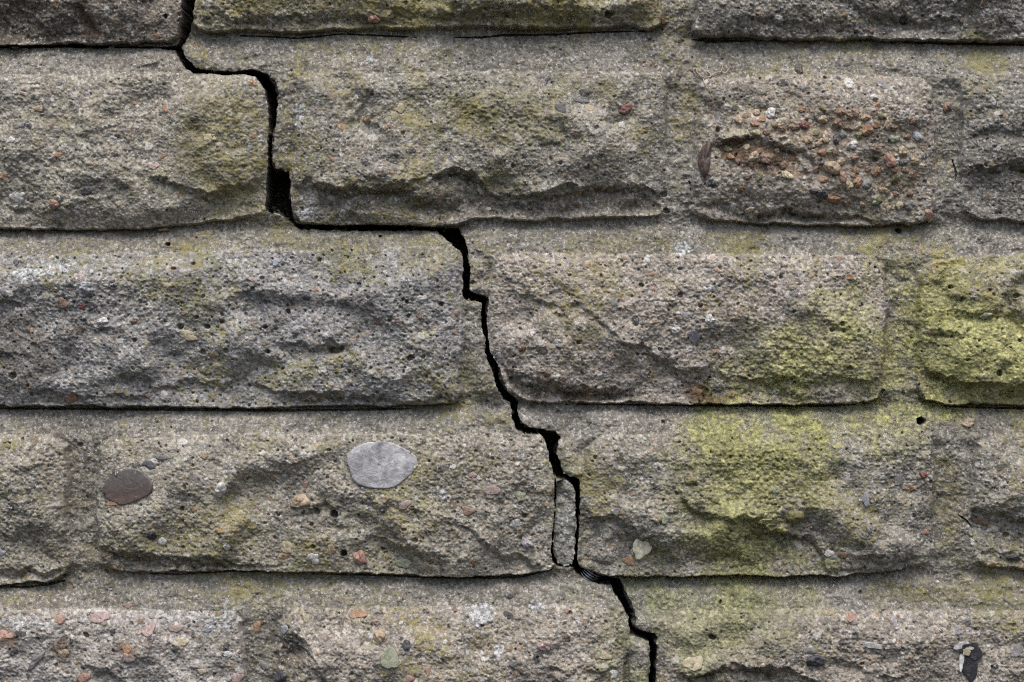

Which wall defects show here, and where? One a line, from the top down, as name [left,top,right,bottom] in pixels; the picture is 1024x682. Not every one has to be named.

crack [0,0,658,682]
crack [565,401,856,409]